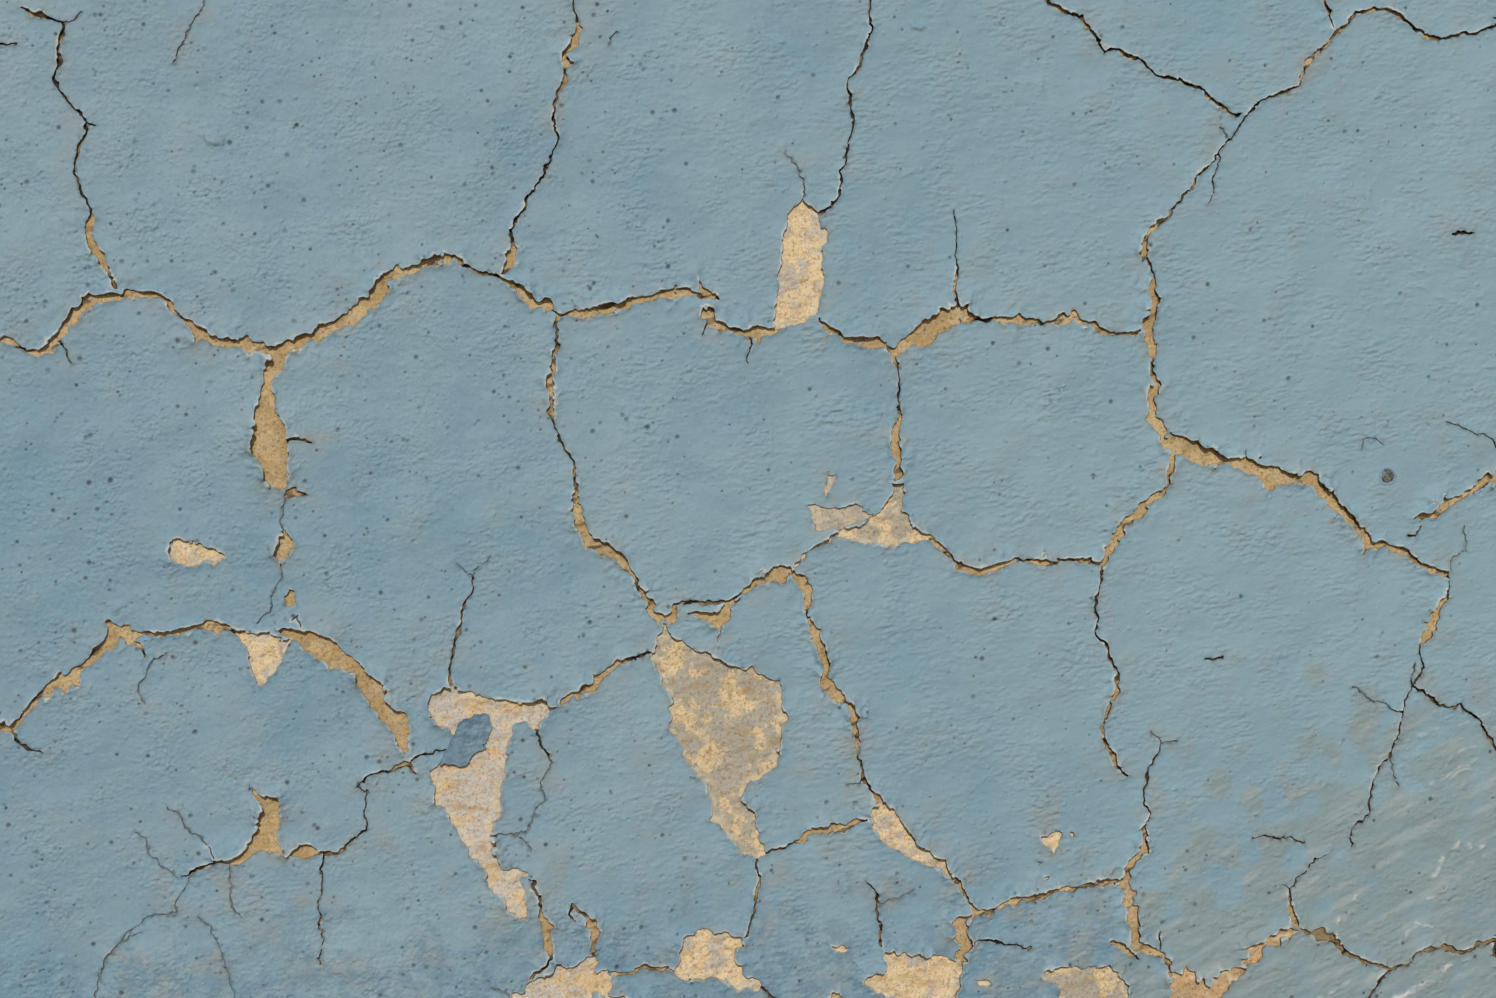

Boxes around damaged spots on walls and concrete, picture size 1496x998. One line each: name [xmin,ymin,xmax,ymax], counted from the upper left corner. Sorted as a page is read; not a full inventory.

peeling [770,156,828,330]
crack [0,0,886,937]
peeling [794,353,935,568]
crack [818,0,1496,974]
peeling [237,346,560,924]
peeling [649,598,789,860]
crack [94,873,235,998]
crack [491,879,675,998]
peeling [668,929,761,996]
crack [824,987,843,998]
peeling [833,939,991,998]
crack [1283,858,1496,998]